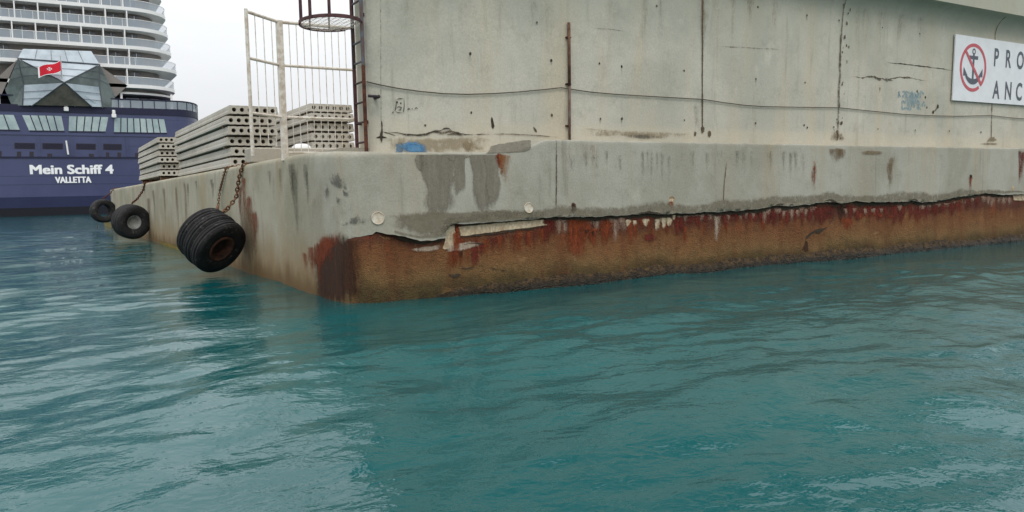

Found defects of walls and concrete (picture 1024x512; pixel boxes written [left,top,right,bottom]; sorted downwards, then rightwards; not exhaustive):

crack [853,62,947,81]
rust [496,154,509,173]
rust [238,179,257,251]
rust [302,236,359,301]
rust [449,227,502,266]
rust [515,203,613,254]
crack [375,162,1015,251]
damp [395,140,1022,239]
rust [723,198,979,231]